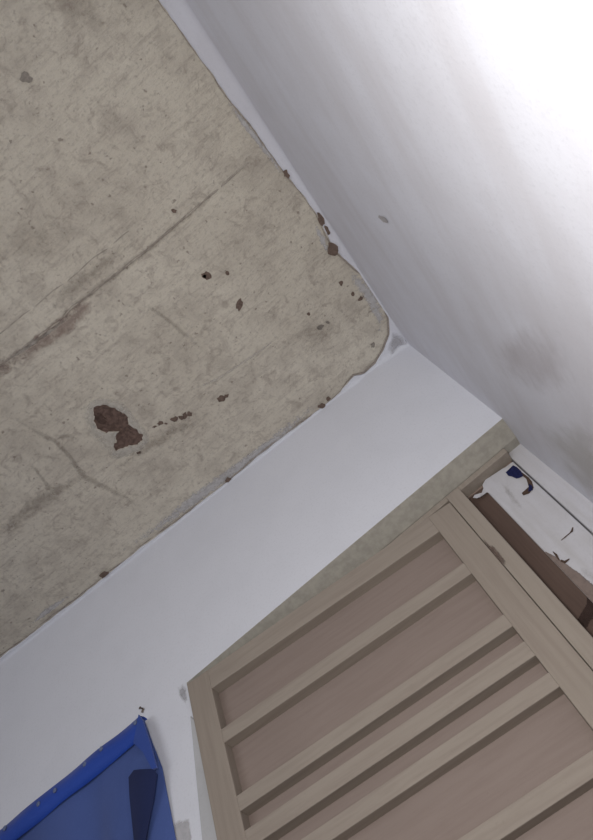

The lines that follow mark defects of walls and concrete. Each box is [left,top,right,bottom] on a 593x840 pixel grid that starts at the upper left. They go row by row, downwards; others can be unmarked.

spalling [19,71,33,83]
peeling [317,212,338,256]
spalling [89,405,147,455]
peeling [473,465,534,510]
peeling [545,552,593,602]